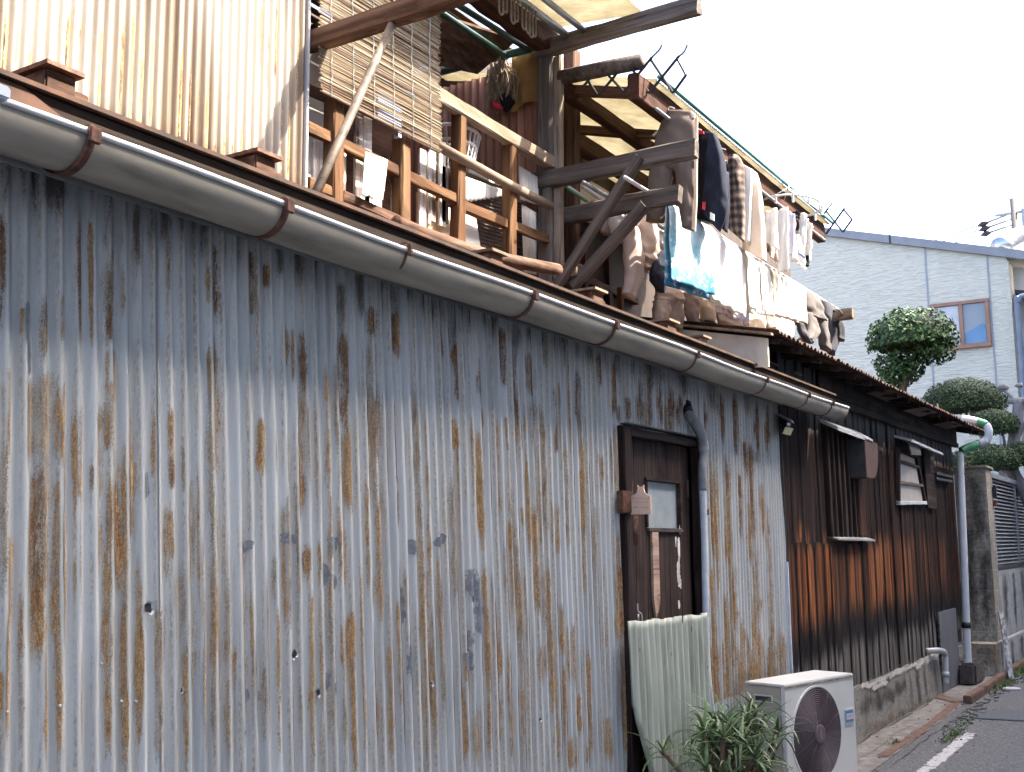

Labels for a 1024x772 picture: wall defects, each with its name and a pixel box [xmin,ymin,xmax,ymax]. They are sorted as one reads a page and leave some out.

rust [76,204,316,347]
rust [0,294,163,770]
rust [150,274,788,772]